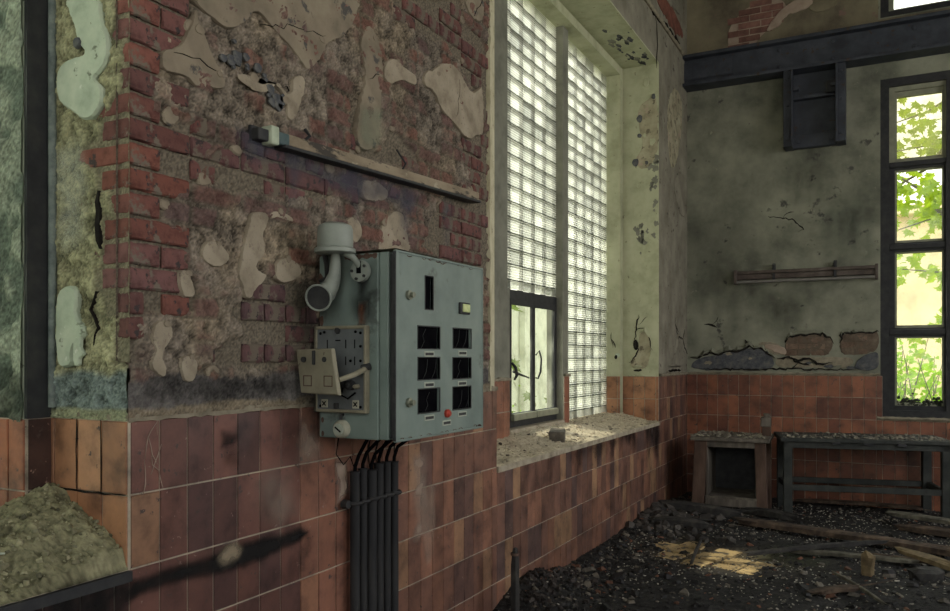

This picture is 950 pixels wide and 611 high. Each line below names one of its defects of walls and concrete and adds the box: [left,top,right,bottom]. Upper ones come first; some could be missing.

spalling [728,0,837,47]
peeling [349,0,488,202]
crack [94,190,103,249]
spalling [55,0,410,382]
spalling [439,201,488,266]
crack [768,212,804,231]
crack [89,291,101,345]
spalling [631,326,652,372]
spalling [668,329,879,372]
crack [60,418,163,496]